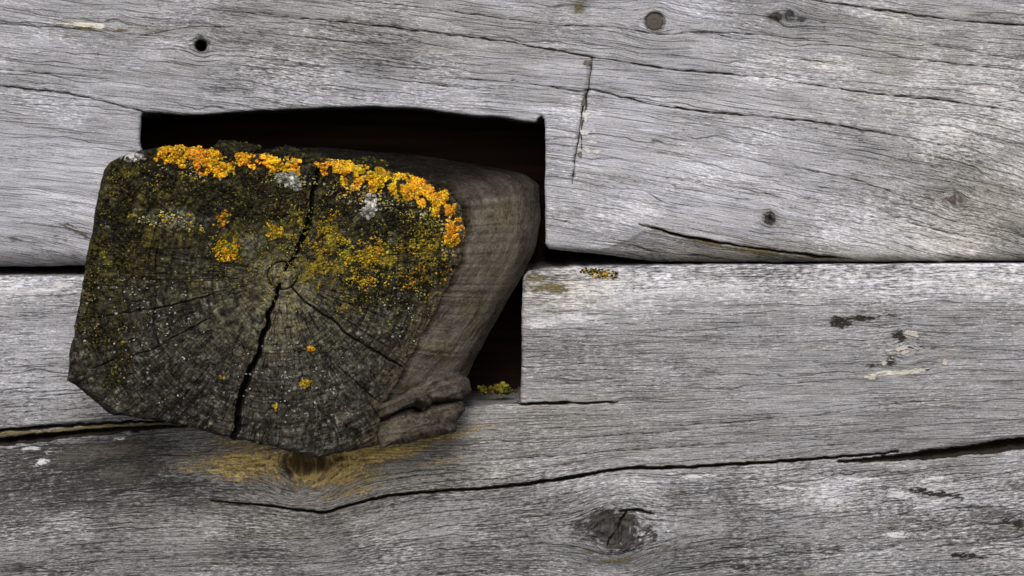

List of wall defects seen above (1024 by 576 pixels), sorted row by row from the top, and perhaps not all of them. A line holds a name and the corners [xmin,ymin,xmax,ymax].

crack [513,80,920,149]
crack [640,224,845,259]
crack [231,168,402,440]
crack [211,399,1024,514]